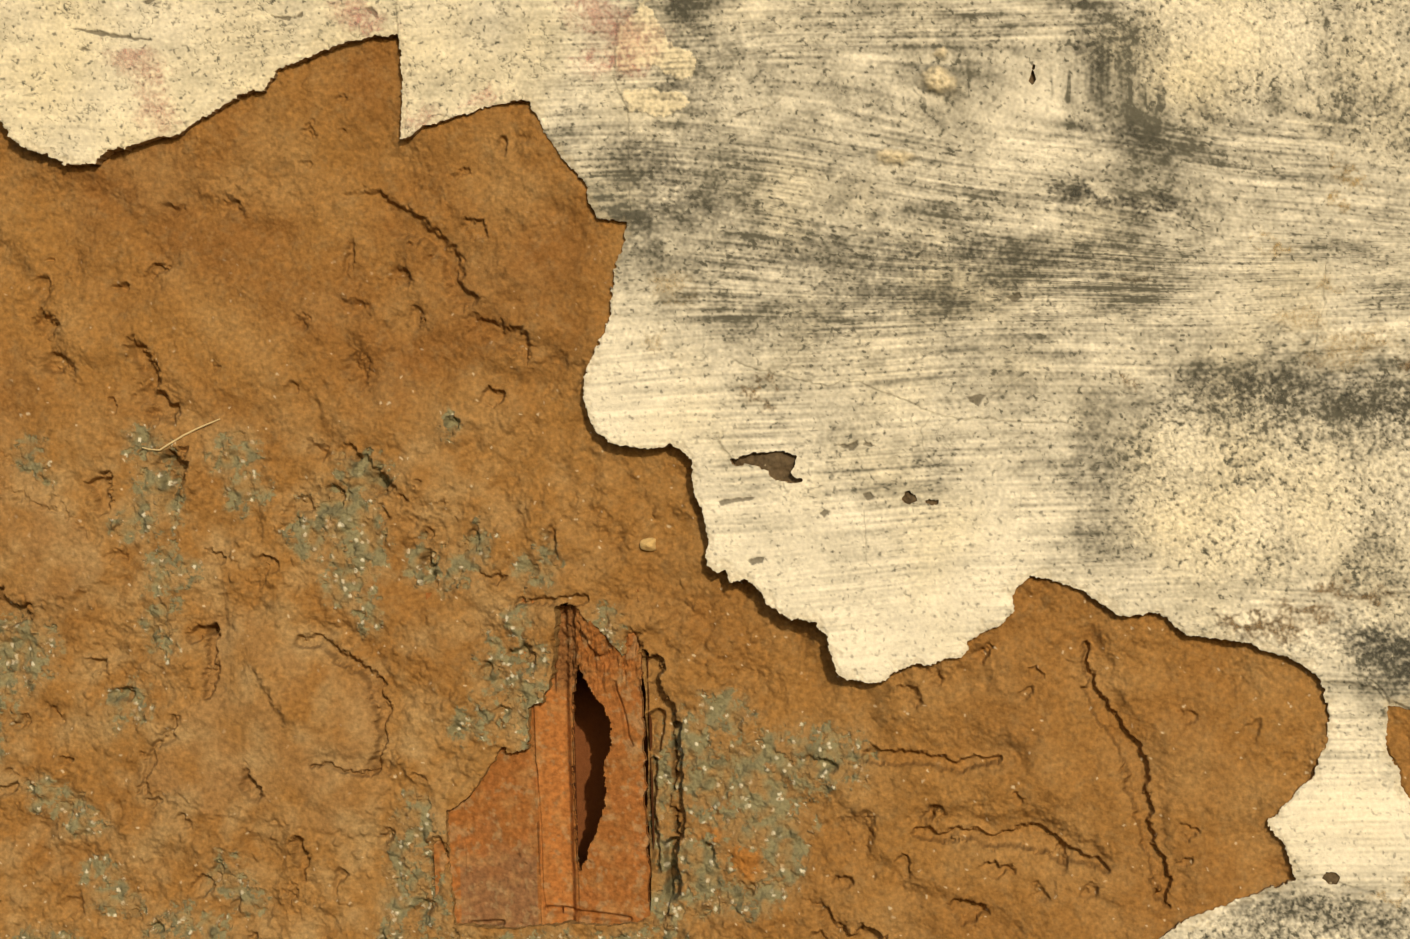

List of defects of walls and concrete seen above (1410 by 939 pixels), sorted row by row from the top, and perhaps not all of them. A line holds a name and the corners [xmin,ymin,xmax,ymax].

peeling [70,28,153,52]
peeling [616,0,699,120]
crack [572,0,677,215]
peeling [836,439,878,452]
crack [733,360,1081,475]
peeling [719,497,758,507]
peeling [748,556,766,567]
spalling [573,666,612,870]
spalling [641,679,649,784]
spalling [1385,706,1410,798]
spalling [391,861,665,939]
spalling [677,853,694,875]